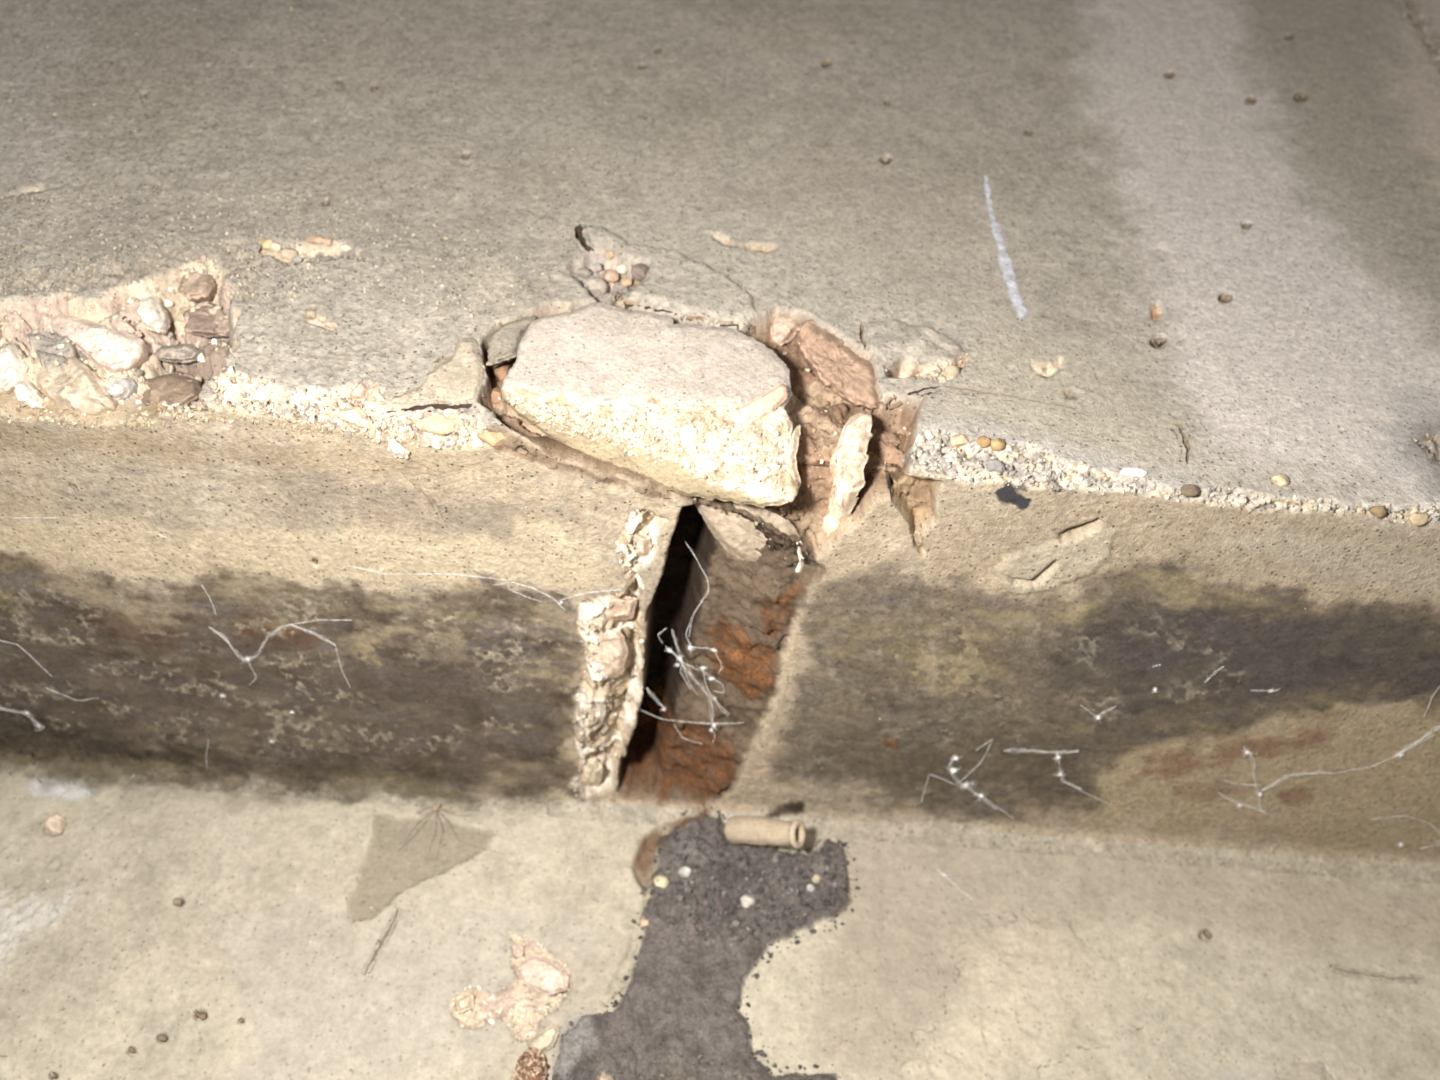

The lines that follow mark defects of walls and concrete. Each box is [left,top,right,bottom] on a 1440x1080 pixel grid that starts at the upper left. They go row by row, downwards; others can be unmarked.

peeling [248,236,364,265]
spalling [0,247,1440,573]
leakage [0,553,581,803]
spalling [566,508,669,801]
rust [617,498,830,807]
spalling [1004,518,1103,589]
leakage [775,564,1440,816]